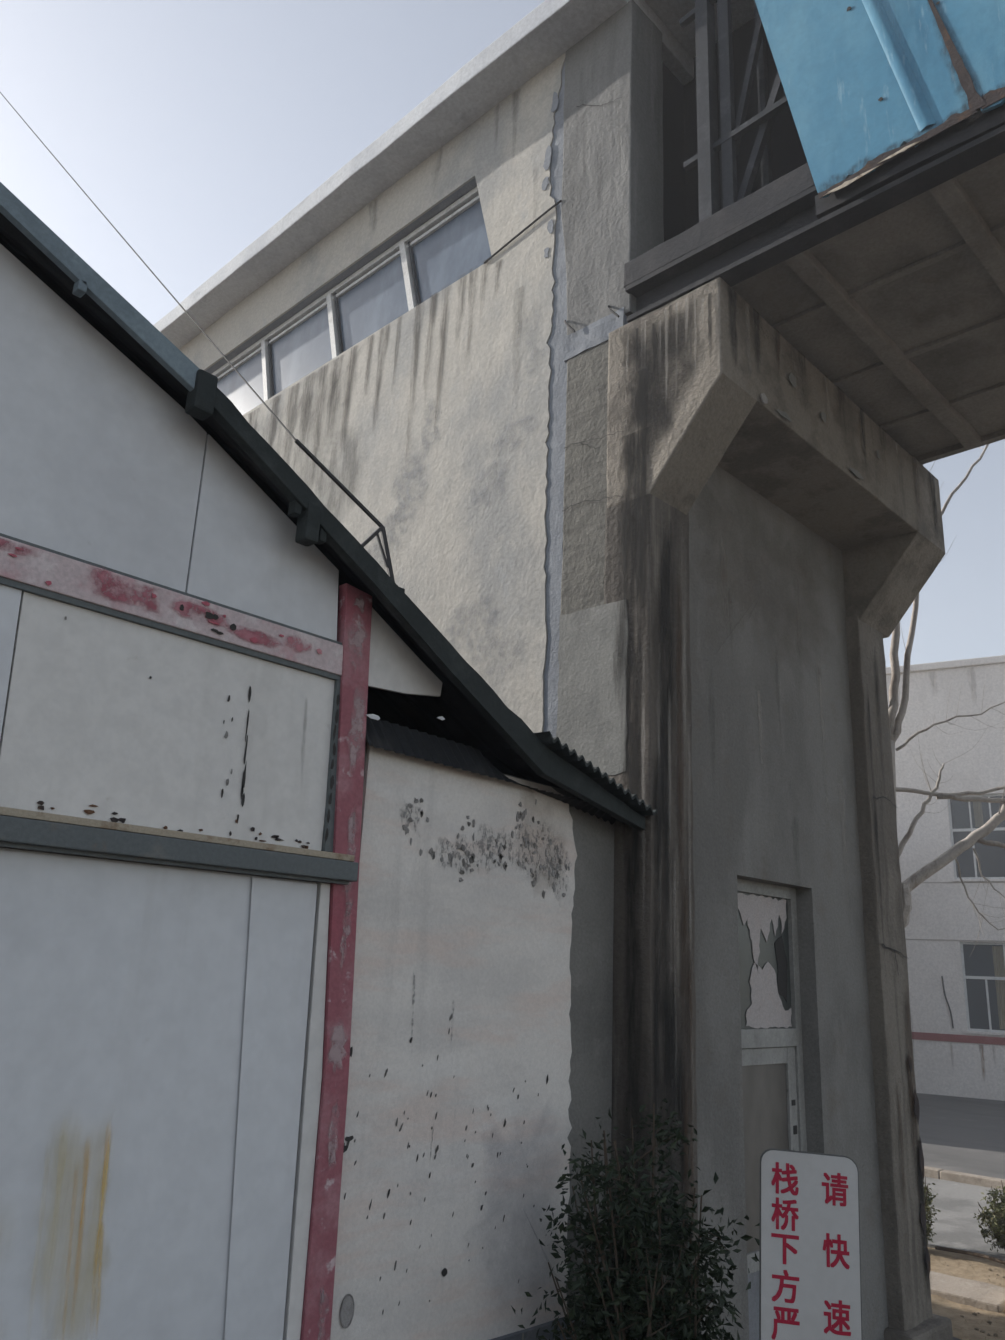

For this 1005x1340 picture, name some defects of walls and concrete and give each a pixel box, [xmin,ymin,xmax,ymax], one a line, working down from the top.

corrosion [818,87,1005,199]
damp [271,325,397,441]
damp [414,293,446,390]
peeling [97,571,157,610]
peeling [174,601,322,654]
damp [617,305,691,797]
peeling [221,686,251,822]
peeling [325,695,364,841]
damp [655,541,693,1221]
peeling [329,1026,353,1065]
flaking render [402,788,614,1312]
peeling [329,1123,357,1165]